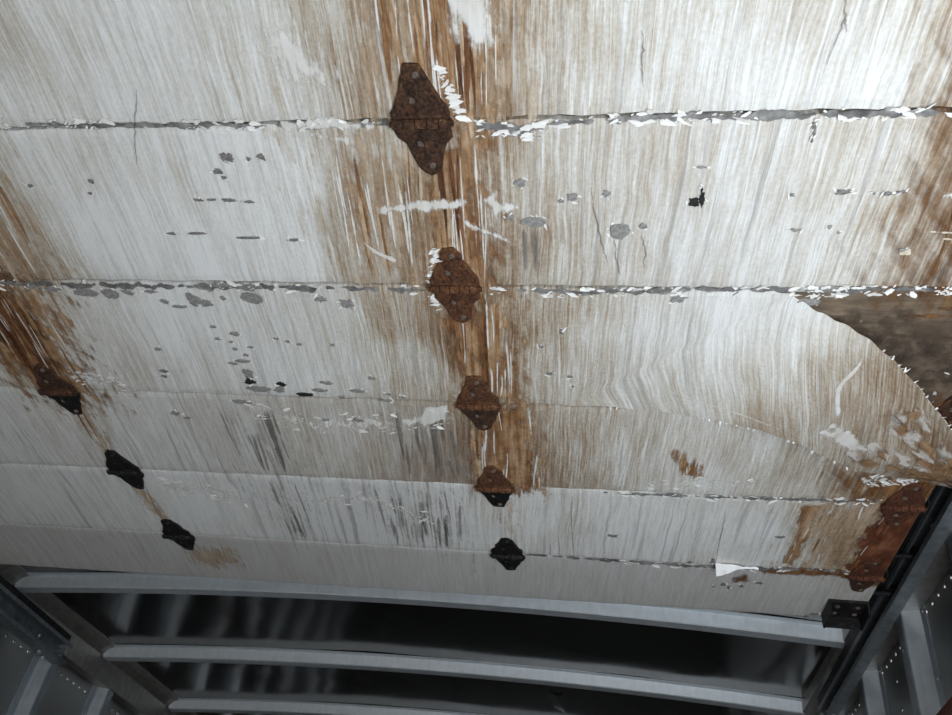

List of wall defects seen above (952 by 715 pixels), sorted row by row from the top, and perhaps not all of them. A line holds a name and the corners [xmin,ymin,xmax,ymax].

peeling [448,0,493,51]
peeling [25,118,389,145]
peeling [209,152,266,181]
peeling [432,65,594,142]
peeling [606,103,952,143]
peeling [380,199,465,214]
corrosion [357,0,549,532]
corrosion [909,179,952,305]
corrosion [0,257,123,452]
peeling [210,325,449,434]
corrosion [671,450,704,479]
corrosion [759,399,952,587]